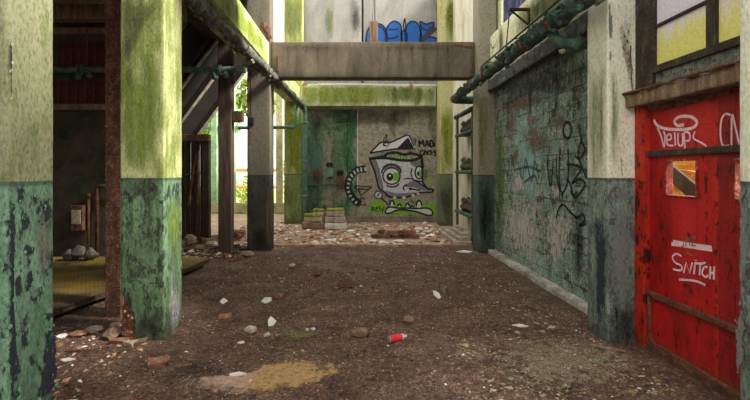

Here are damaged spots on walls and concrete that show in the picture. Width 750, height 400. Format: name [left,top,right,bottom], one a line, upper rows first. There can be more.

water stain [308,88,372,102]
peeling [502,175,574,272]
peeling [8,187,34,400]